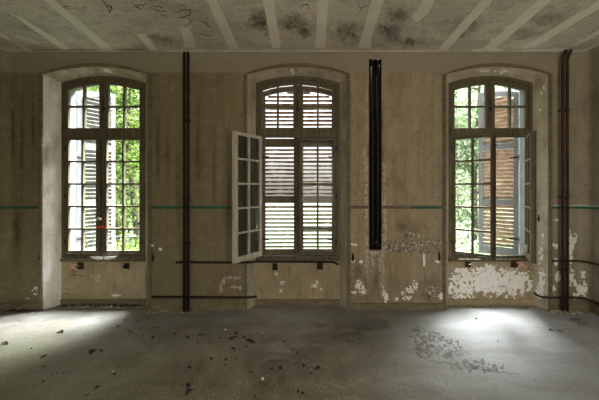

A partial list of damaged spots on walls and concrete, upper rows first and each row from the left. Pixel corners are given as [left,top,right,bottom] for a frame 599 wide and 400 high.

crack [132,2,210,36]
peeling [351,71,561,303]
peeling [569,230,588,297]